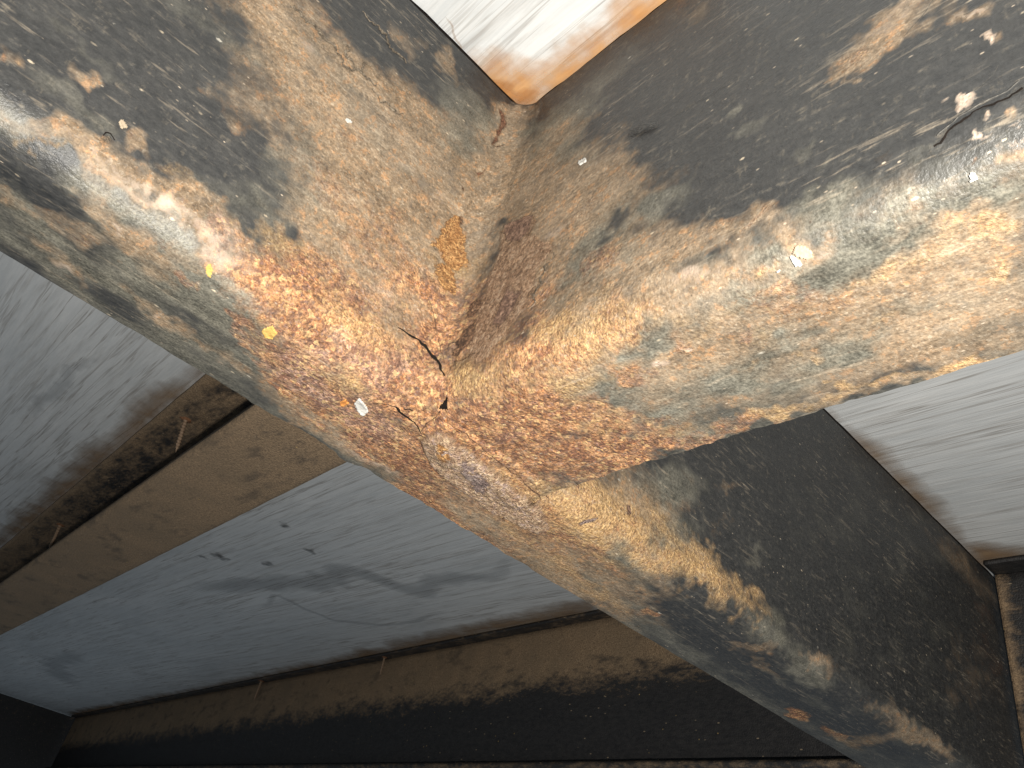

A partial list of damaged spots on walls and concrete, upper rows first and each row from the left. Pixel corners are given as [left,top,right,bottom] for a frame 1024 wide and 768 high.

corrosion [484,0,666,105]
crack [398,286,445,376]
corrosion [431,215,469,294]
corrosion [470,215,555,363]
crack [379,403,440,433]